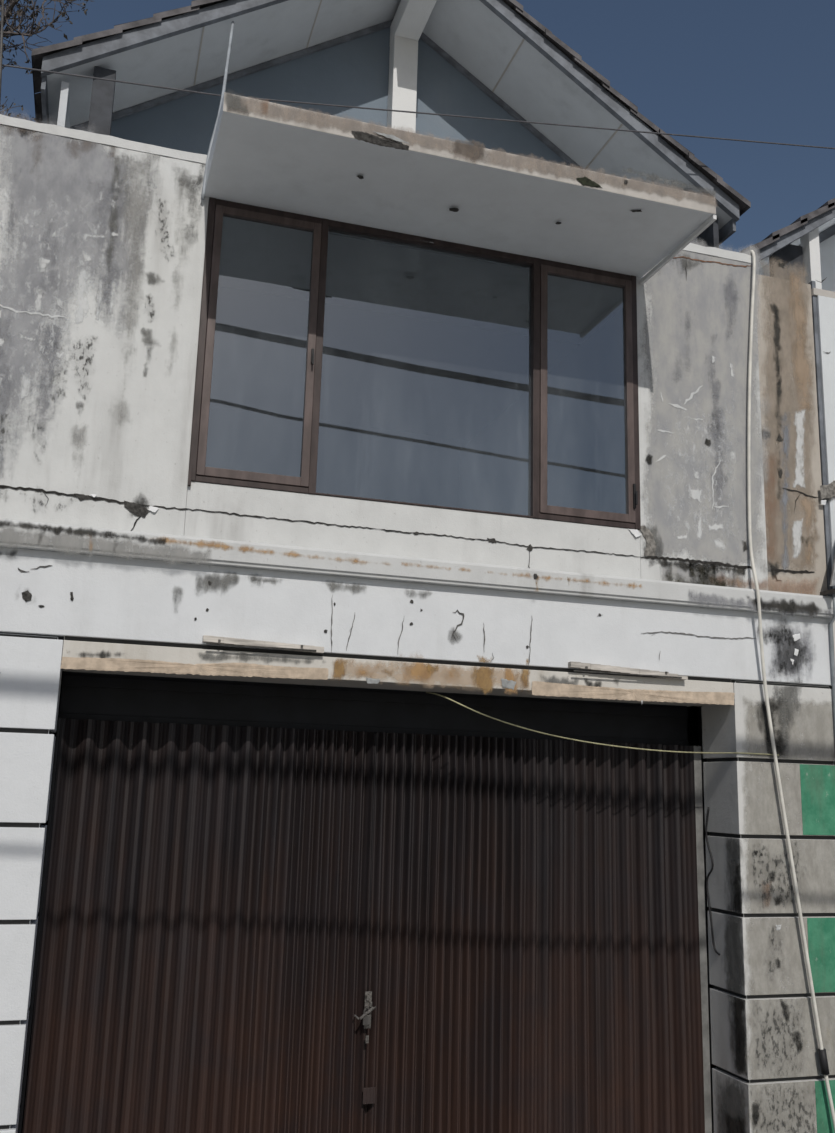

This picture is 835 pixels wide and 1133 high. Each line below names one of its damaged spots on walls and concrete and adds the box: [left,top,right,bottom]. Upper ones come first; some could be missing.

spalling [352,131,410,151]
damp [0,118,158,433]
damp [645,242,831,616]
peeling [793,411,805,487]
damp [0,521,207,563]
rust [162,538,273,553]
crack [0,485,819,581]
peeling [792,519,803,557]
damp [197,574,238,590]
peeling [60,651,476,686]
peeling [489,669,735,705]
damp [717,627,835,1133]